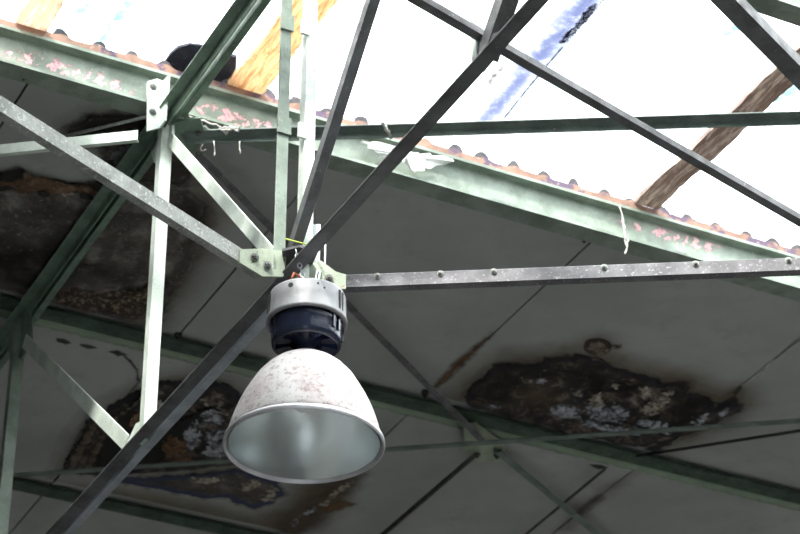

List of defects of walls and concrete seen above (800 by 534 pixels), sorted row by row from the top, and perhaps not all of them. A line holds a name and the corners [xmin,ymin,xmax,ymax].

peeling [0,50,135,95]
water stain [68,113,147,137]
peeling [195,103,272,128]
water stain [100,143,133,168]
water stain [138,162,156,183]
water stain [170,151,190,187]
rust [434,337,490,388]
peeling [63,418,121,476]
peeling [106,389,142,437]
peeling [129,379,241,475]
peeling [456,353,744,452]
water stain [111,468,338,528]